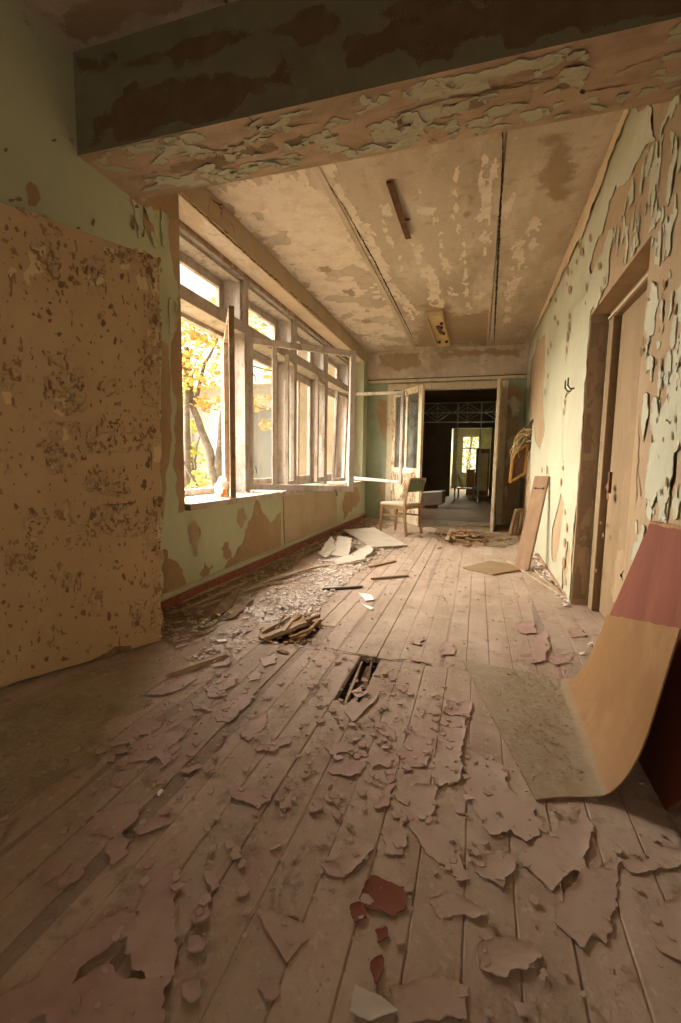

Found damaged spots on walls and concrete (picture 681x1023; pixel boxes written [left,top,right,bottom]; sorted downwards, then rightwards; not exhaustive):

peeling [8,246,46,286]
peeling [92,47,599,594]